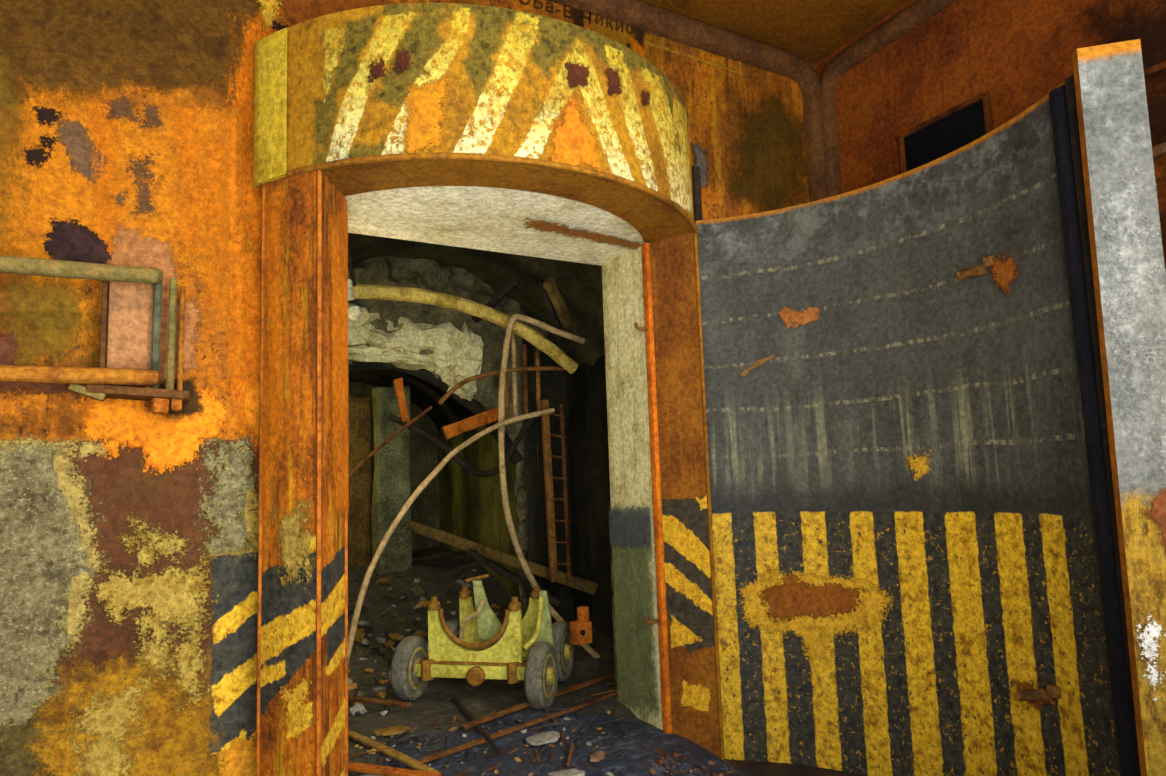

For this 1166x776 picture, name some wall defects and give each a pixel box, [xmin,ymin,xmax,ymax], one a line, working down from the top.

corrosion [365,47,415,84]
corrosion [564,61,623,96]
corrosion [630,36,647,58]
corrosion [641,87,652,109]
peeling [19,104,108,184]
corrosion [0,0,384,519]
corrosion [989,250,1023,295]
corrosion [778,306,820,329]
peeling [0,222,317,733]
corrosion [1145,488,1166,554]
corrosion [734,567,893,664]
peeling [210,729,256,776]